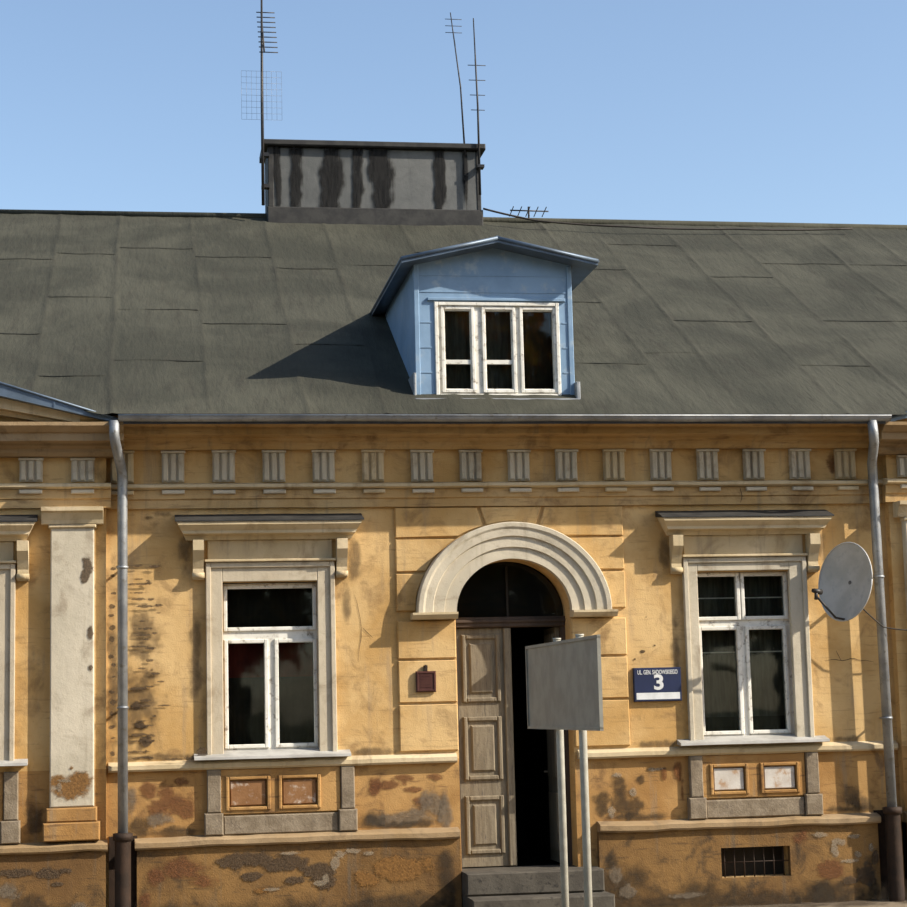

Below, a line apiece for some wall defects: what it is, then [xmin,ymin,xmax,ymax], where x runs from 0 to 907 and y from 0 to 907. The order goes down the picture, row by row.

peeling [50,767,92,800]
flaking render [140,778,194,818]
flaking render [369,775,426,805]
spalling [217,849,373,891]